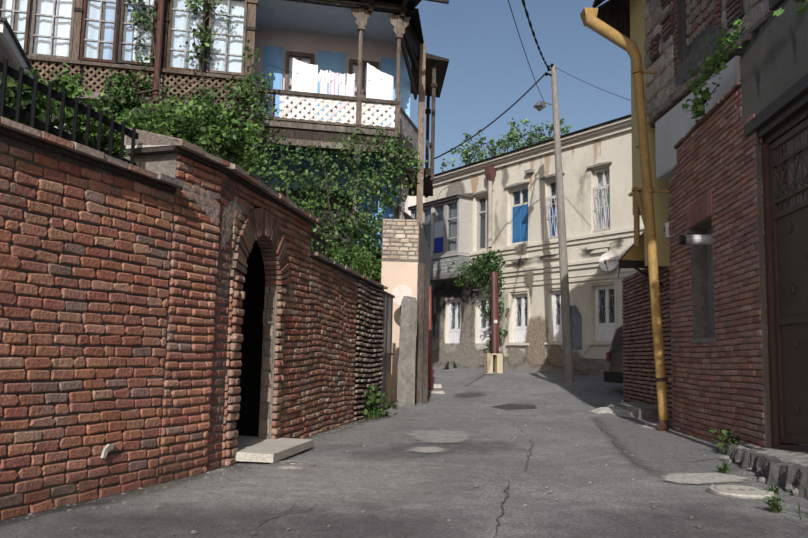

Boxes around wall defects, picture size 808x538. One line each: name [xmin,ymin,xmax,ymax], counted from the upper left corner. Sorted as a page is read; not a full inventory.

water stain [431,281,480,347]
spalling [432,316,604,373]
crack [496,481,510,533]